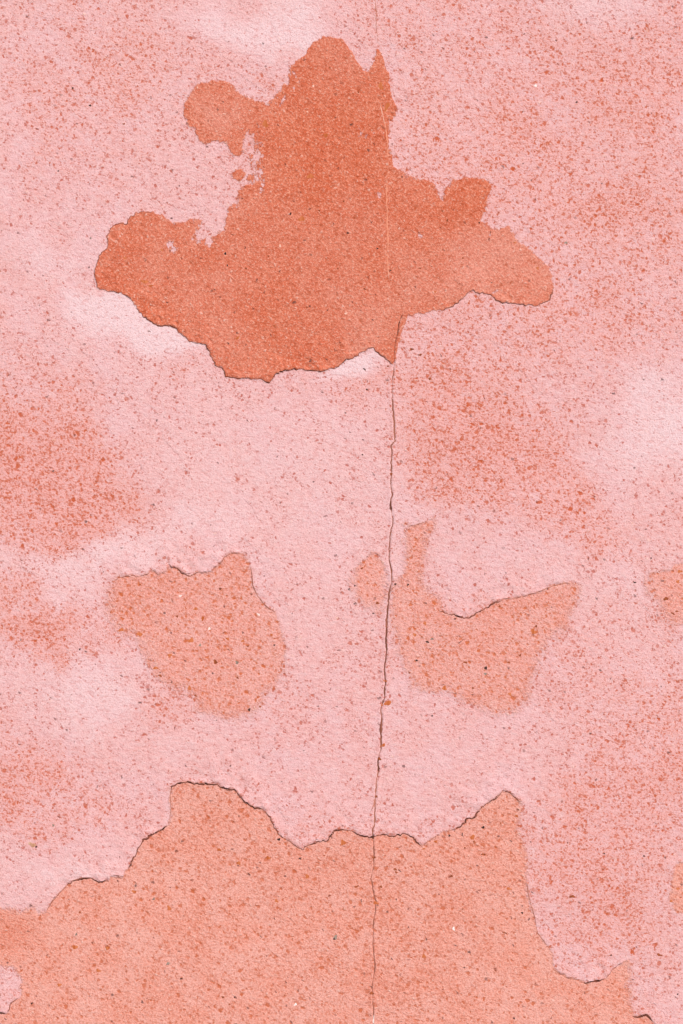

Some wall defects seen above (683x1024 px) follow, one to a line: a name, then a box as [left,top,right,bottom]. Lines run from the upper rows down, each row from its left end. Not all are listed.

peeling [81,23,567,397]
peeling [93,539,299,731]
crack [47,315,519,1024]
peeling [339,504,595,728]
peeling [0,765,669,1024]